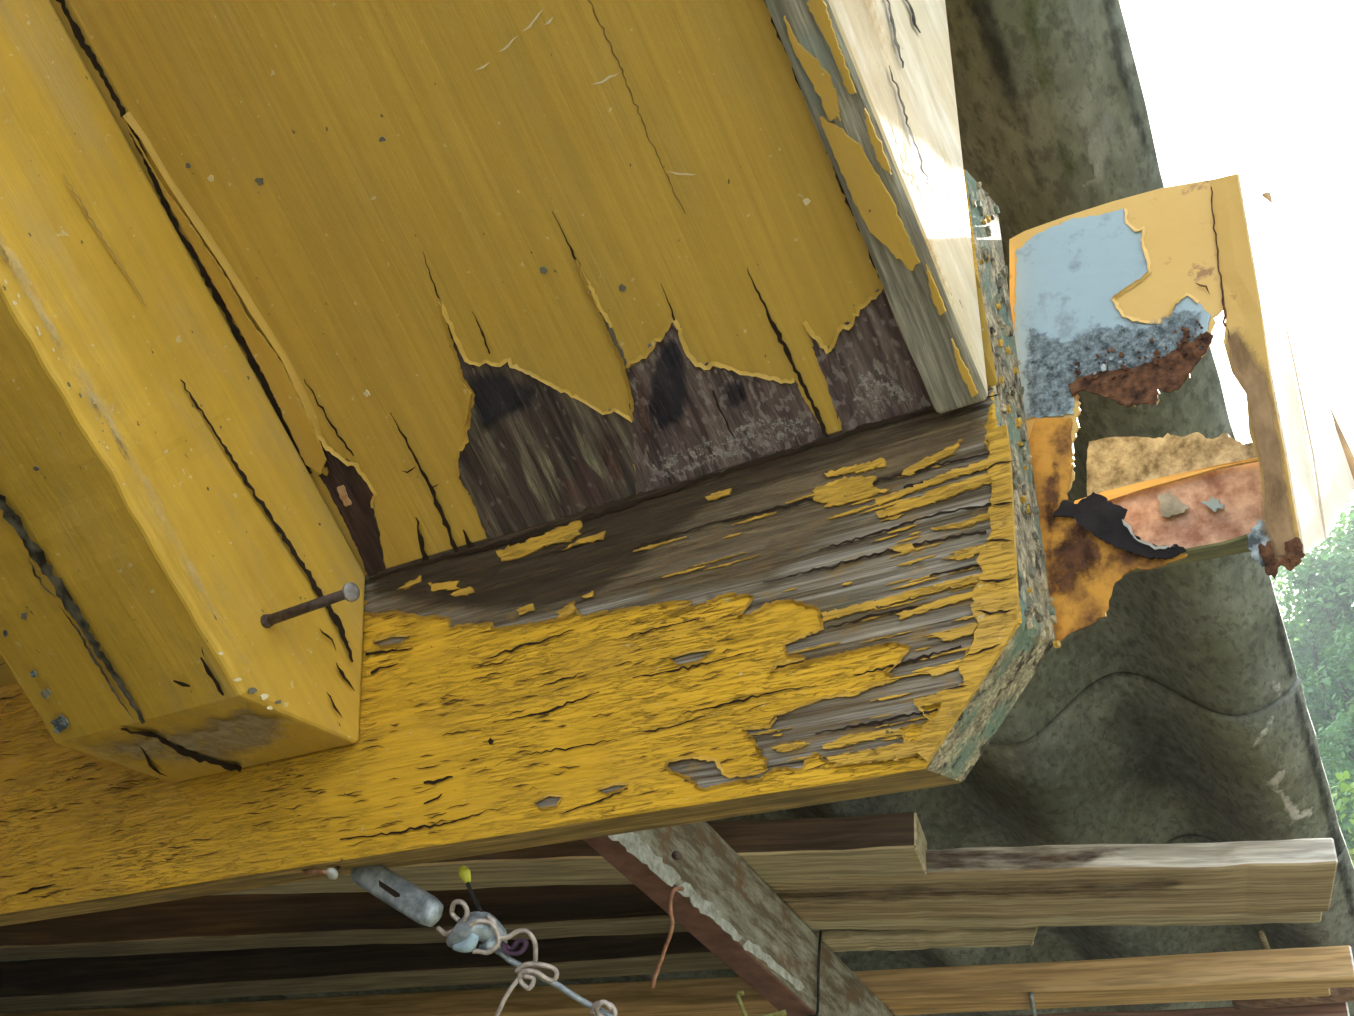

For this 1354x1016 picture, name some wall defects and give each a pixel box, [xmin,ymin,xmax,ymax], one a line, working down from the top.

crack [56,0,312,474]
peeling [783,0,947,315]
crack [0,494,242,776]
peeling [337,485,352,507]
peeling [364,181,1211,791]
rust [1023,310,1305,596]
peeling [533,793,564,811]
peeling [597,783,629,796]